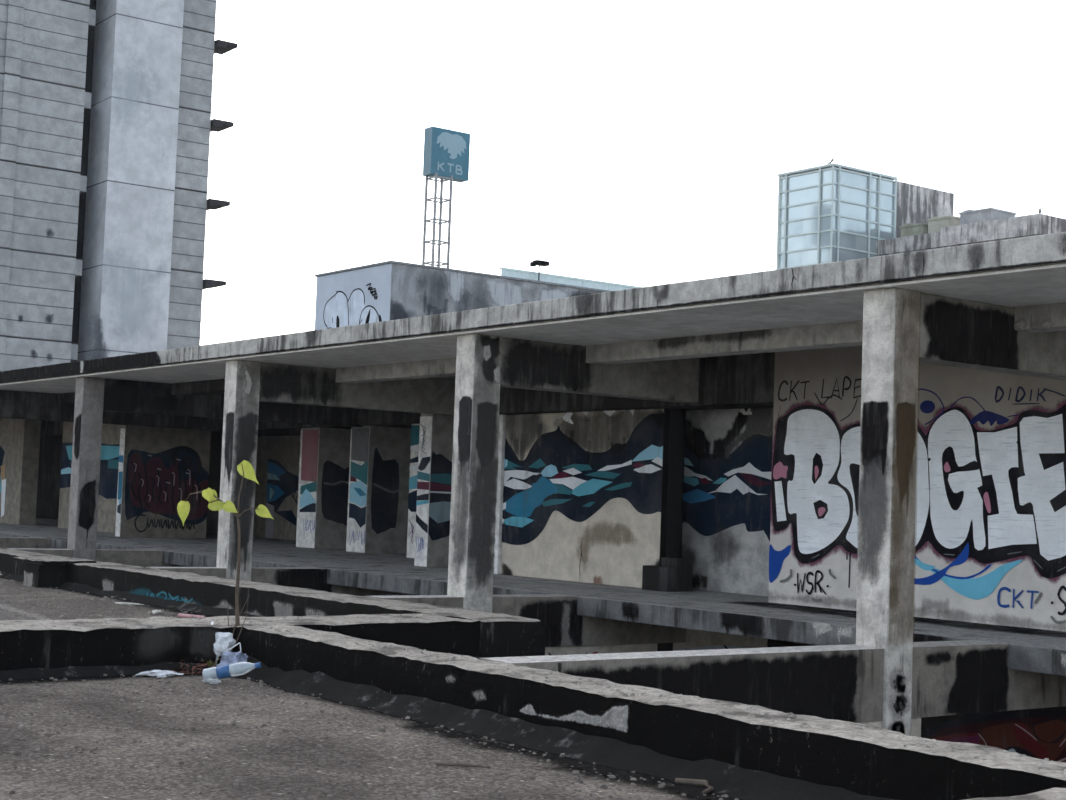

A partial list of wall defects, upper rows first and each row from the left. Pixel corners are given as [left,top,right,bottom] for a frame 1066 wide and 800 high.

leakage [0,234,1066,414]
leakage [506,413,544,462]
leakage [561,410,664,453]
leakage [685,408,773,473]
leakage [453,446,856,647]
spalling [520,704,628,732]